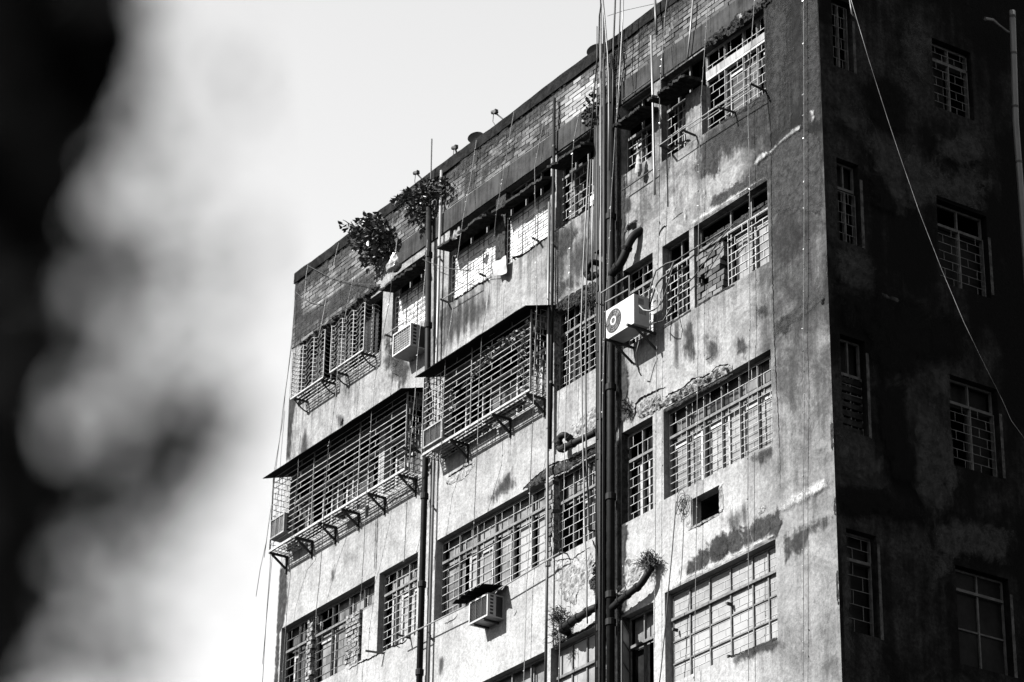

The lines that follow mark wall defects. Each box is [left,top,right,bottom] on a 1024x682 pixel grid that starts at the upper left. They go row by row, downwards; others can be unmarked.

water stain [694,0,823,224]
water stain [674,321,718,362]
spalling [664,364,733,412]
water stain [679,505,827,578]